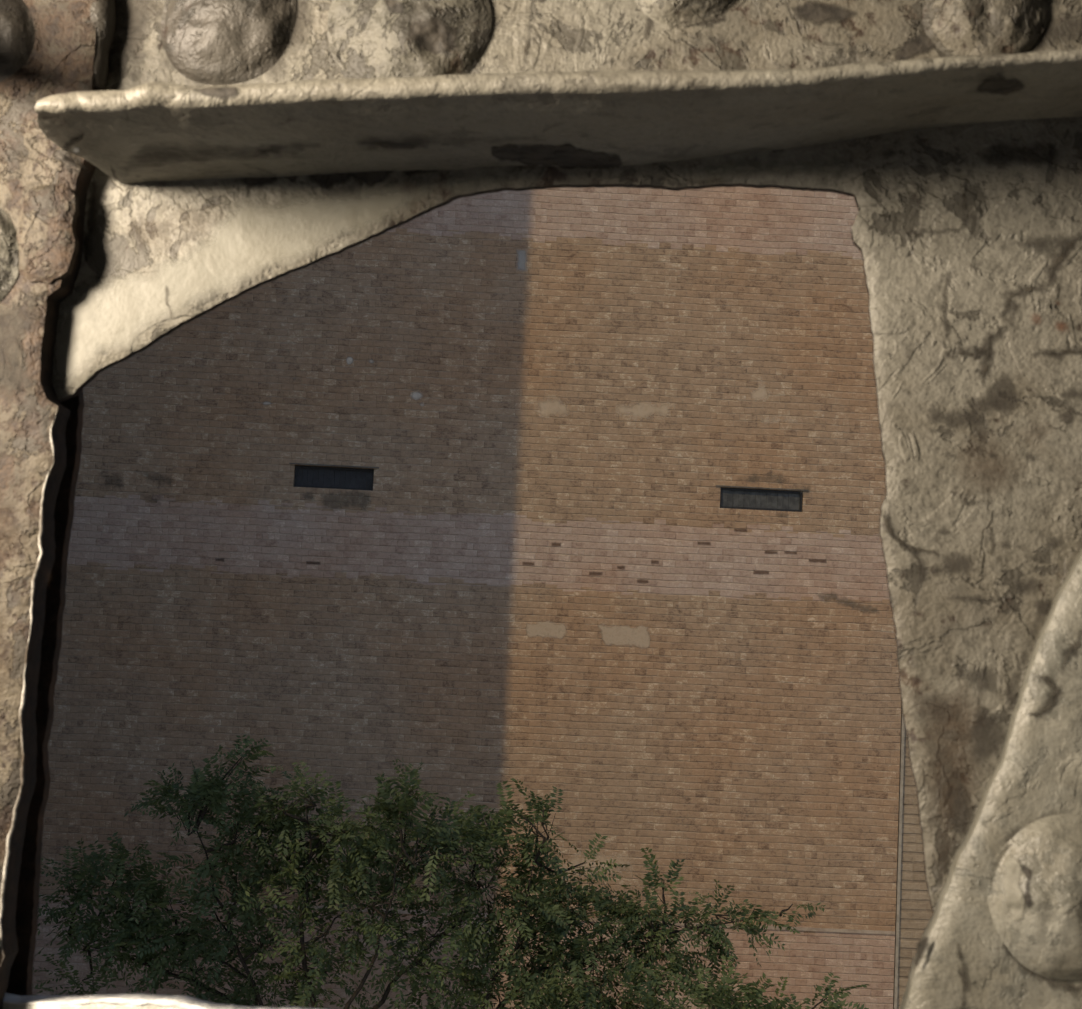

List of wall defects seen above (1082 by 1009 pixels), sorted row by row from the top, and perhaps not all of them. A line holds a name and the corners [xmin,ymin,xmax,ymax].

crack [943,239,1076,373]
crack [1046,349,1082,358]
crack [883,514,939,578]
crack [1030,632,1082,715]